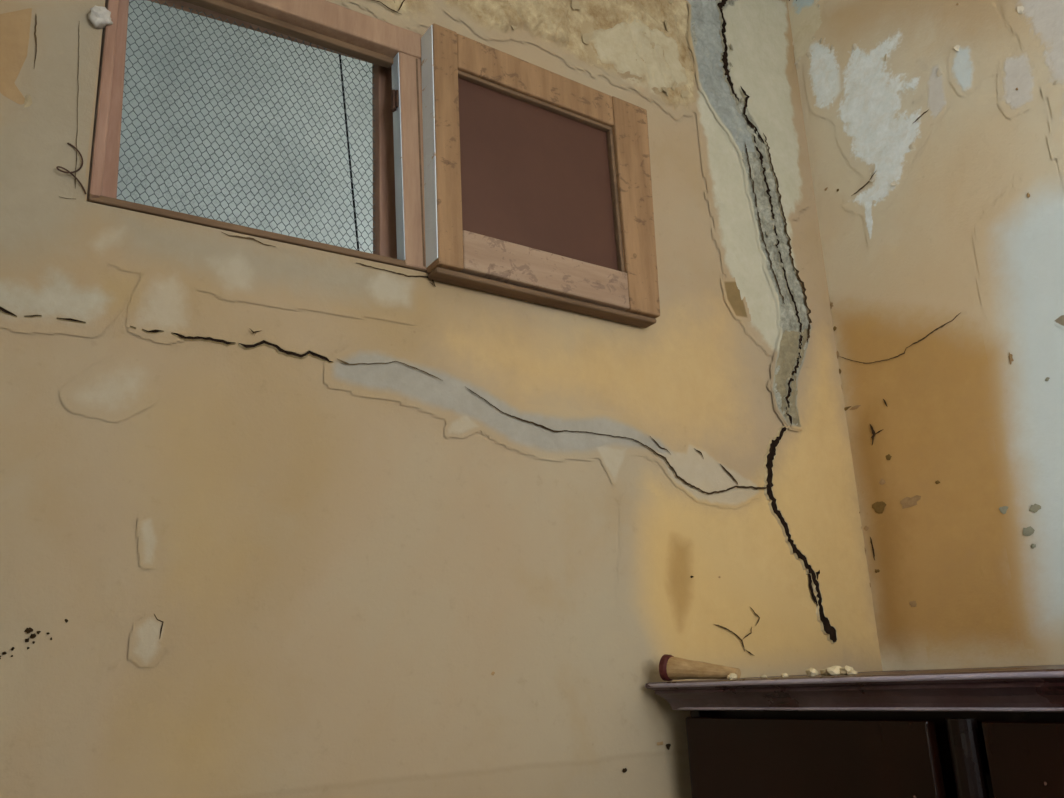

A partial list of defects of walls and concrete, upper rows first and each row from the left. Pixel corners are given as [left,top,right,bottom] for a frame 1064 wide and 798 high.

peeling [787,0,980,217]
peeling [996,0,1064,188]
peeling [343,0,814,431]
crack [0,306,86,324]
crack [130,0,838,644]
crack [839,313,960,364]
crack [870,399,887,445]
peeling [651,442,762,509]
crack [714,607,760,655]